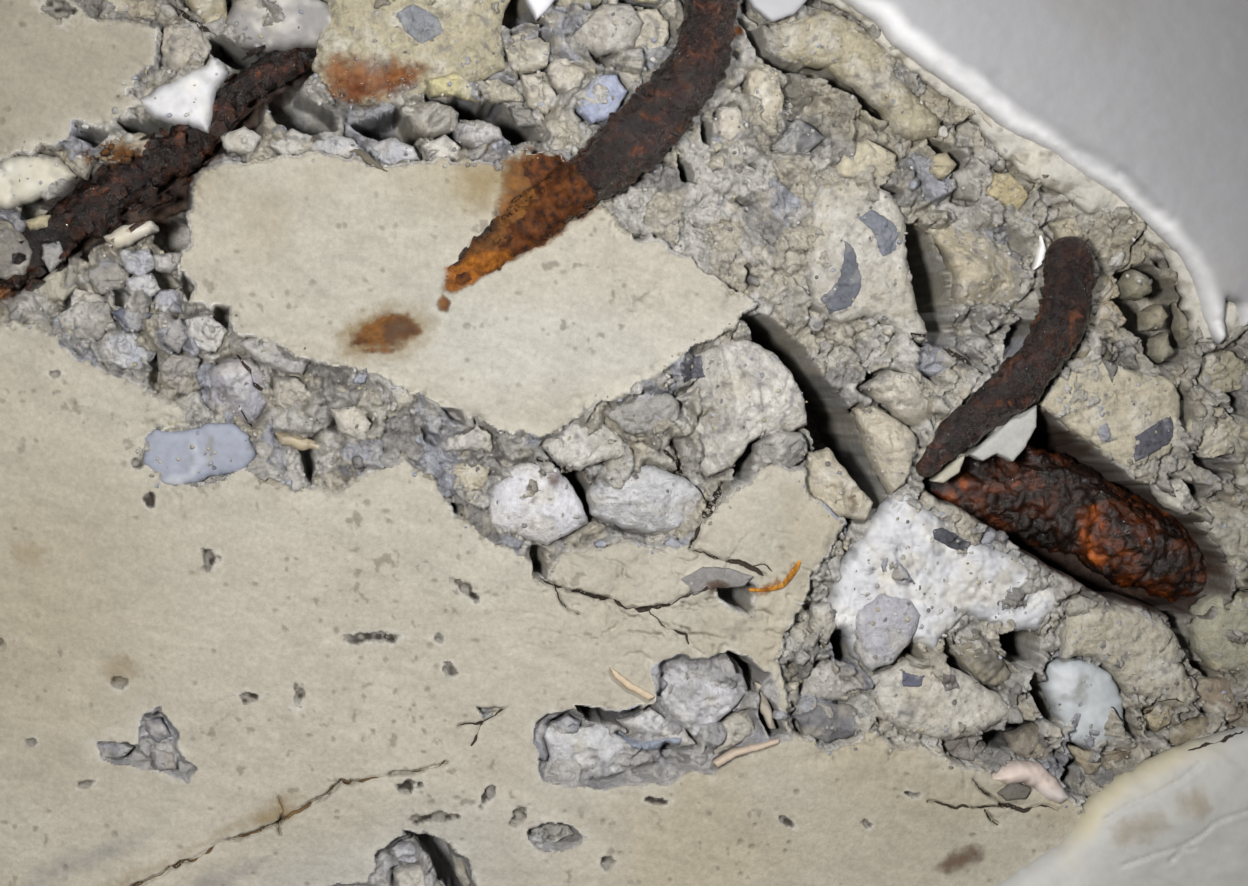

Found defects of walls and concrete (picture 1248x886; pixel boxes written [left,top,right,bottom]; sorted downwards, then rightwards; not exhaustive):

spalling [0,0,303,238]
rust [0,45,423,298]
rust [438,0,742,311]
rust [354,314,421,353]
rust [916,236,1207,602]
spalling [132,441,181,510]
spalling [715,581,759,618]
spalling [340,630,408,648]
spalling [95,706,197,784]
crack [133,761,445,886]
spalling [332,810,477,886]
spalling [394,778,424,797]